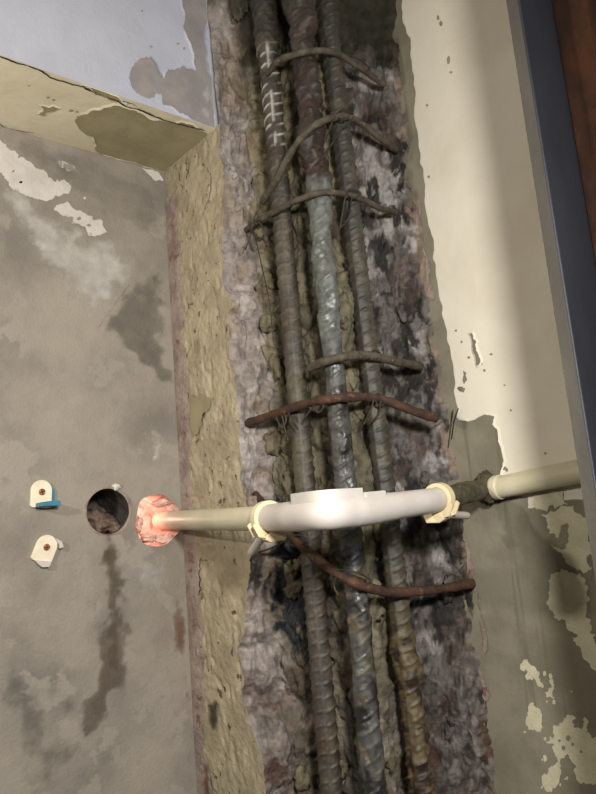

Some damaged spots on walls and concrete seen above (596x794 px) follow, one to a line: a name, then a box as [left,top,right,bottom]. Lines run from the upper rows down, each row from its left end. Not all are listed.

peeling [0,140,107,236]
spalling [36,0,295,507]
spalling [277,0,334,491]
spalling [314,32,375,492]
spalling [339,0,508,492]
leakage [91,627,124,715]
spalling [237,531,321,794]
spalling [320,530,364,794]
spalling [362,524,408,794]
peeling [400,496,596,794]